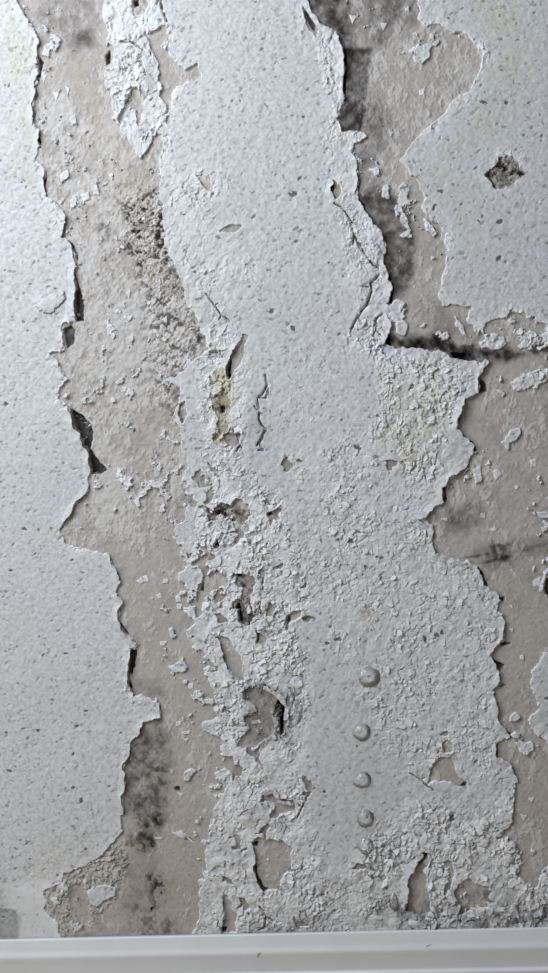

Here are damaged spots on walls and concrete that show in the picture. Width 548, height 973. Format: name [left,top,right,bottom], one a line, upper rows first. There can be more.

water stain [316,0,368,131]
water stain [362,194,394,212]
water stain [379,222,413,288]
water stain [406,335,471,356]
peeling [10,0,316,937]
peeling [297,0,548,929]